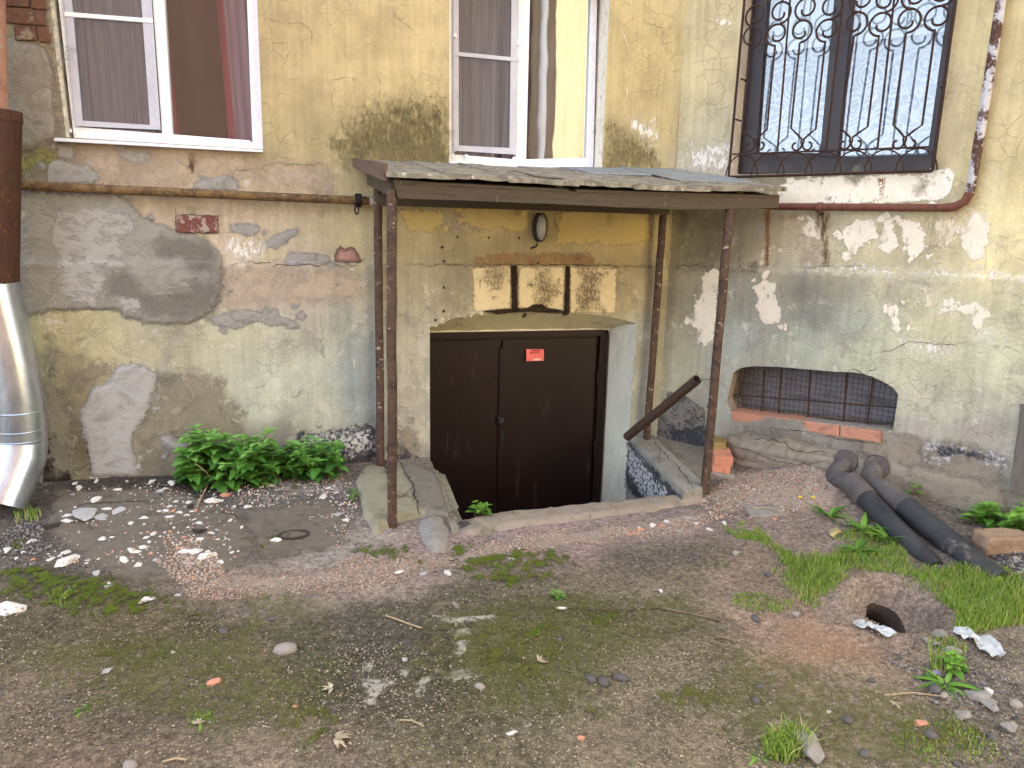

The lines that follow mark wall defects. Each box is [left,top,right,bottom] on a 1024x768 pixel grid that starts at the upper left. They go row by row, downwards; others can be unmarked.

water stain [349,104,448,161]
flaking render [175,207,267,260]
peeling [683,243,792,347]
peeling [797,207,1024,355]
crack [384,461,420,515]